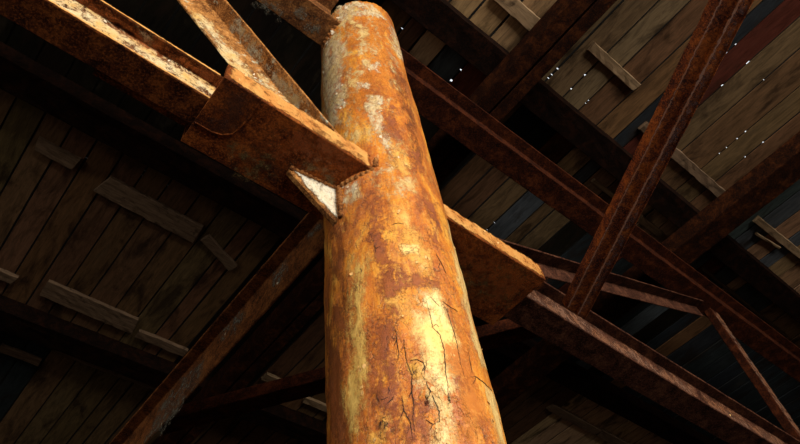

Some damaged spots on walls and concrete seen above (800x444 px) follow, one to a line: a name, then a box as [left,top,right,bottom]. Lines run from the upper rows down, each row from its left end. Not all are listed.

rust [49,0,222,98]
rust [264,128,362,180]
rust [339,18,424,174]
rust [568,0,742,315]
rust [326,220,352,444]
rust [365,190,444,444]
crack [383,300,492,438]
rust [442,300,488,441]
rust [715,313,800,433]